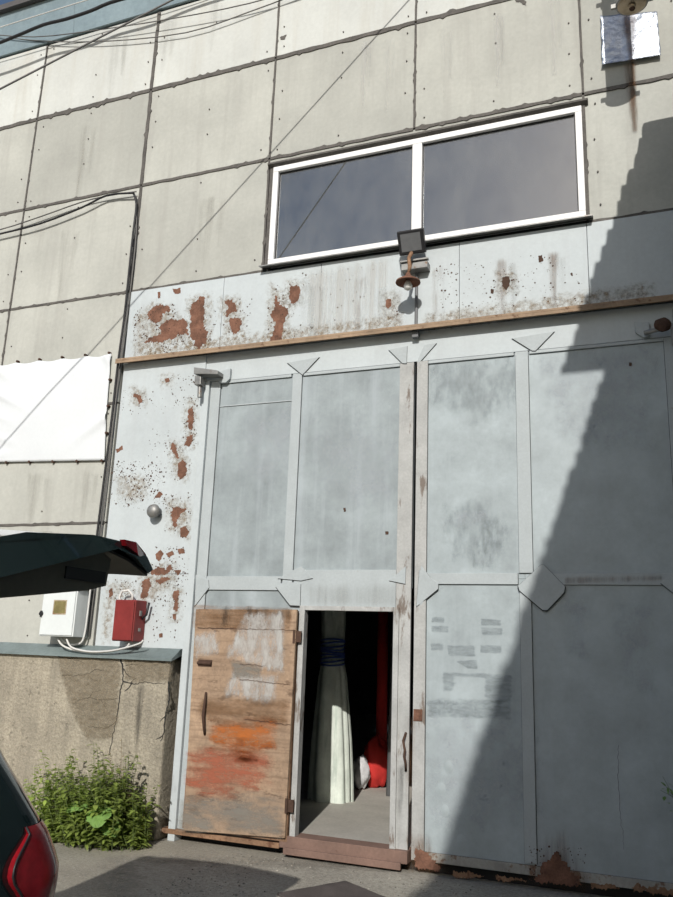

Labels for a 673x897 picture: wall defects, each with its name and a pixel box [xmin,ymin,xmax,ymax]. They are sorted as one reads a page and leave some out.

crack [58,653,172,755]
corrosion [414,848,441,872]
corrosion [496,846,620,890]